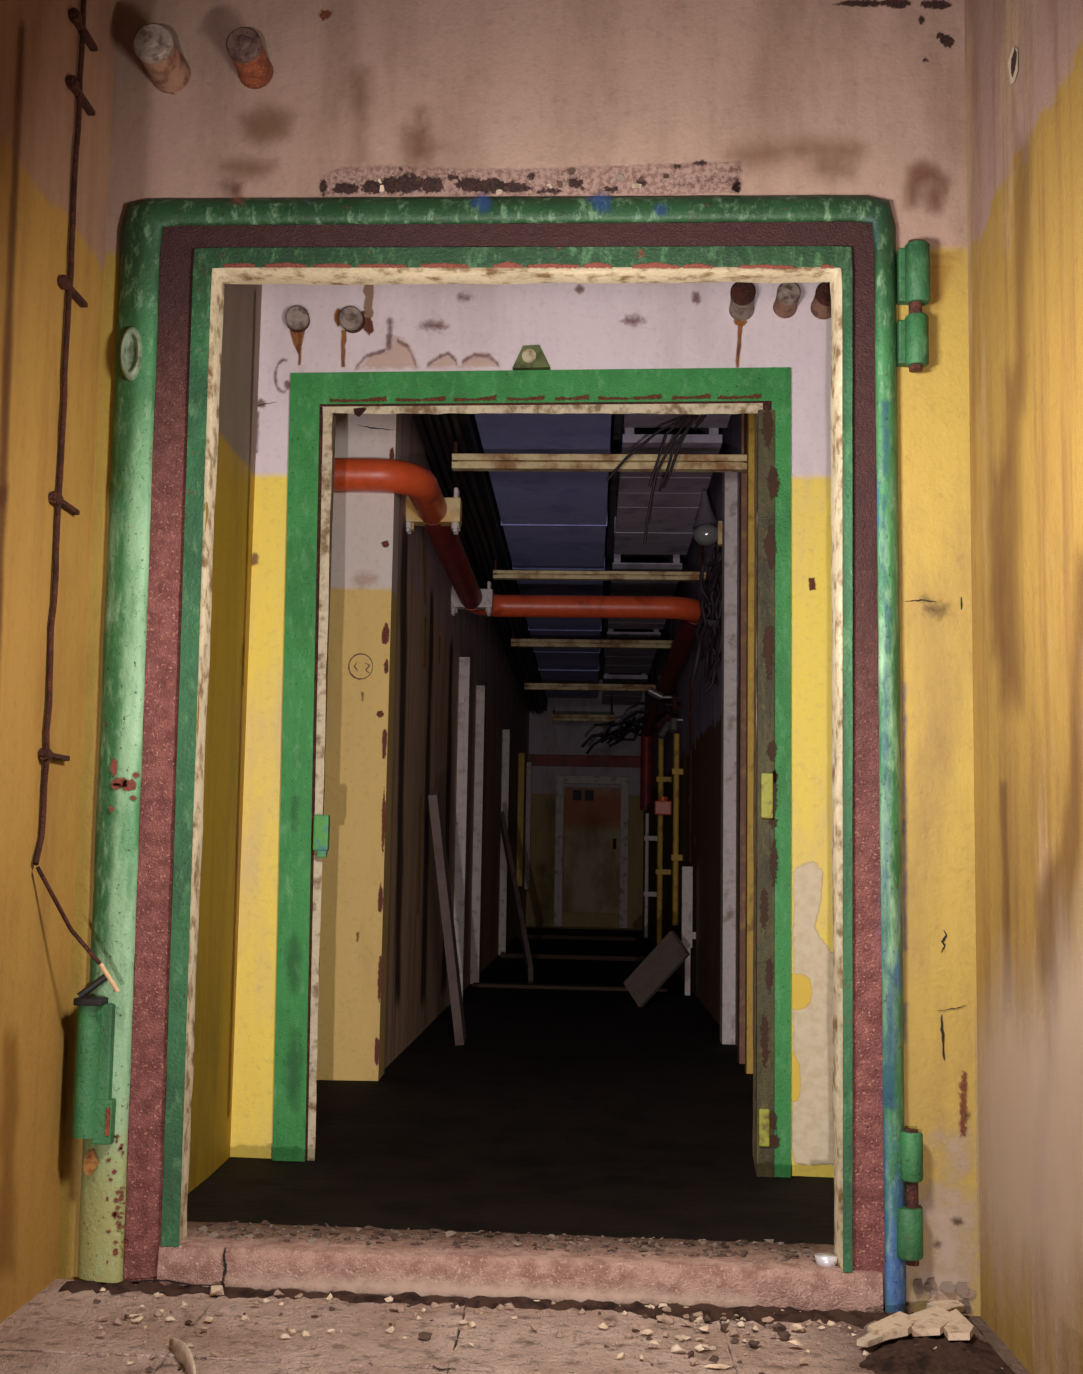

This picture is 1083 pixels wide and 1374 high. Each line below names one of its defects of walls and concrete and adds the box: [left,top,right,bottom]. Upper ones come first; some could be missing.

flaking render [833,0,952,24]
flaking render [936,32,955,48]
flaking render [320,160,742,197]
corrosion [290,330,305,365]
corrosion [334,309,346,367]
corrosion [361,311,374,335]
peeling [763,519,777,569]
peeling [762,626,774,679]
peeling [759,741,834,1165]